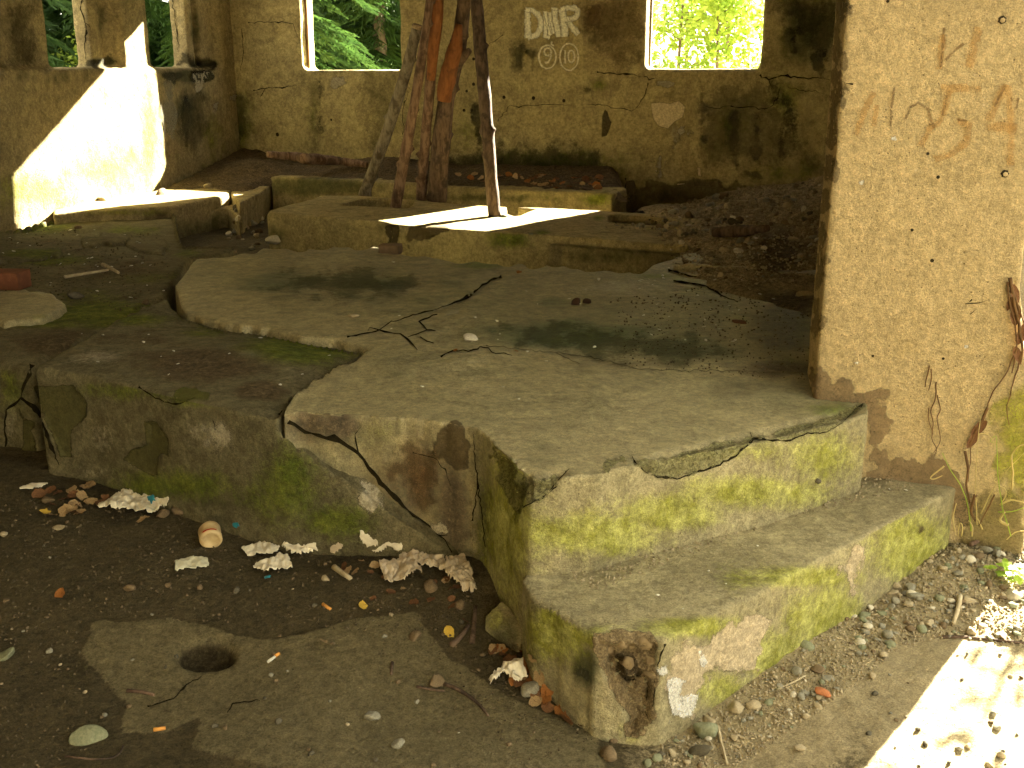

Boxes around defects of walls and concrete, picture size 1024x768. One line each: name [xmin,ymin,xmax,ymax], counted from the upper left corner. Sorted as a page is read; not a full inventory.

damp [161,80,178,138]
damp [176,53,216,92]
crack [498,71,654,120]
damp [779,0,835,76]
crack [347,275,803,373]
crack [4,364,59,465]
crack [632,403,863,480]
crack [278,410,452,552]
spalling [592,614,771,738]